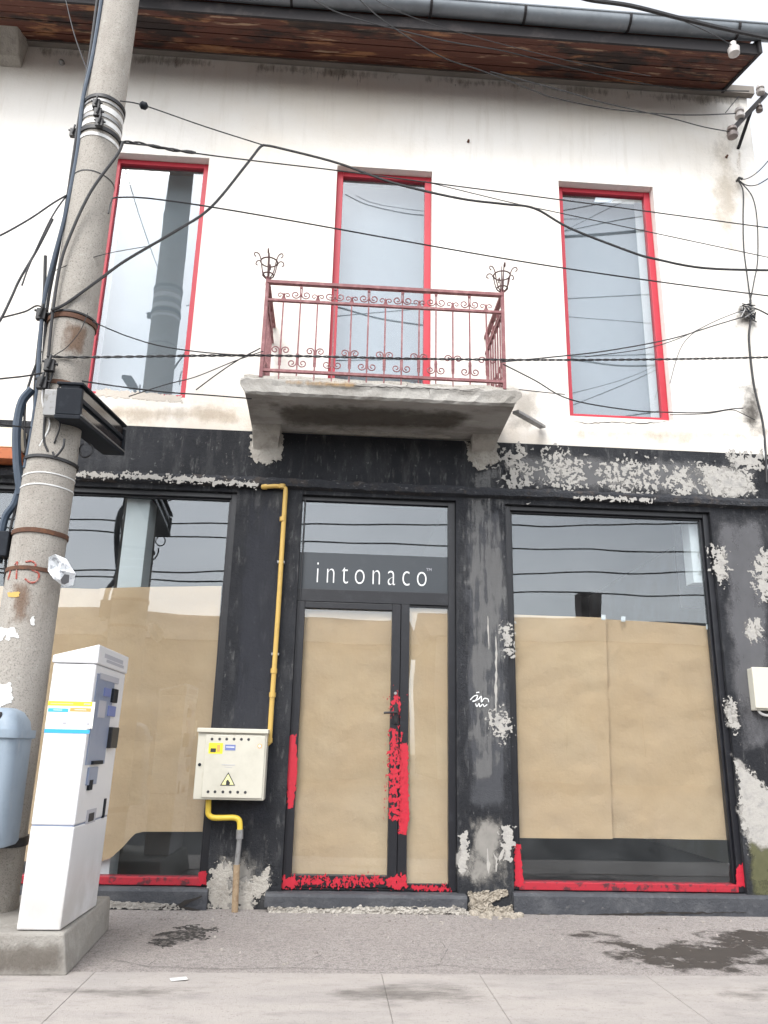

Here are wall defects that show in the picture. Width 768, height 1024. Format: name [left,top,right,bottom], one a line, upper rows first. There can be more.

peeling [75,470,259,490]
peeling [464,440,768,506]
peeling [705,543,768,603]
peeling [745,617,764,644]
peeling [485,704,515,747]
peeling [722,695,741,736]
flaking render [733,759,768,850]
spalling [197,825,524,915]
water stain [571,929,768,972]